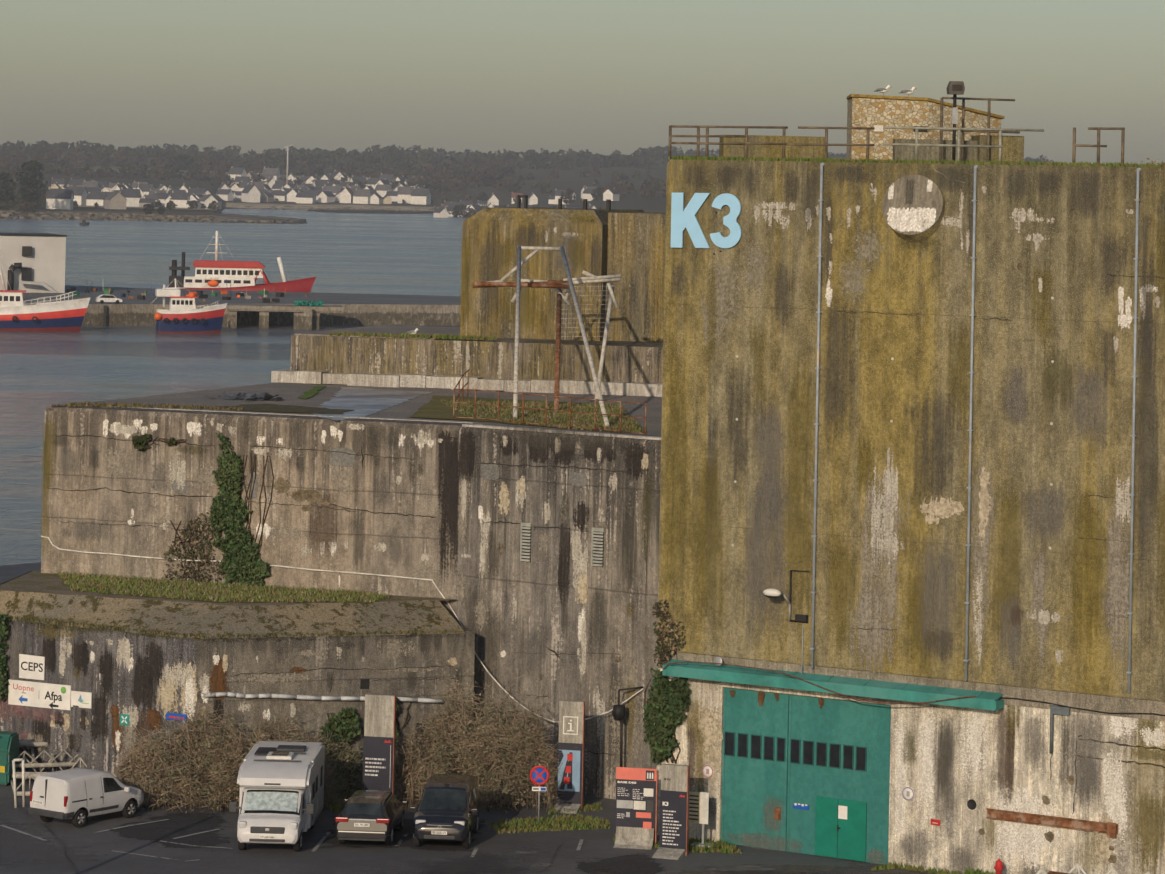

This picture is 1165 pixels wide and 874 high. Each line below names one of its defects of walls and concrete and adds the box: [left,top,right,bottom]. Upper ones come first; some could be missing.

damp [719,166,886,419]
damp [56,419,158,477]
damp [312,387,545,688]
damp [539,498,605,679]
damp [491,428,655,490]
damp [850,447,909,674]
spalling [920,496,964,525]
damp [1077,209,1161,667]
damp [12,638,165,753]
peeling [156,661,199,722]
rust [209,654,230,722]
damp [894,706,1060,874]